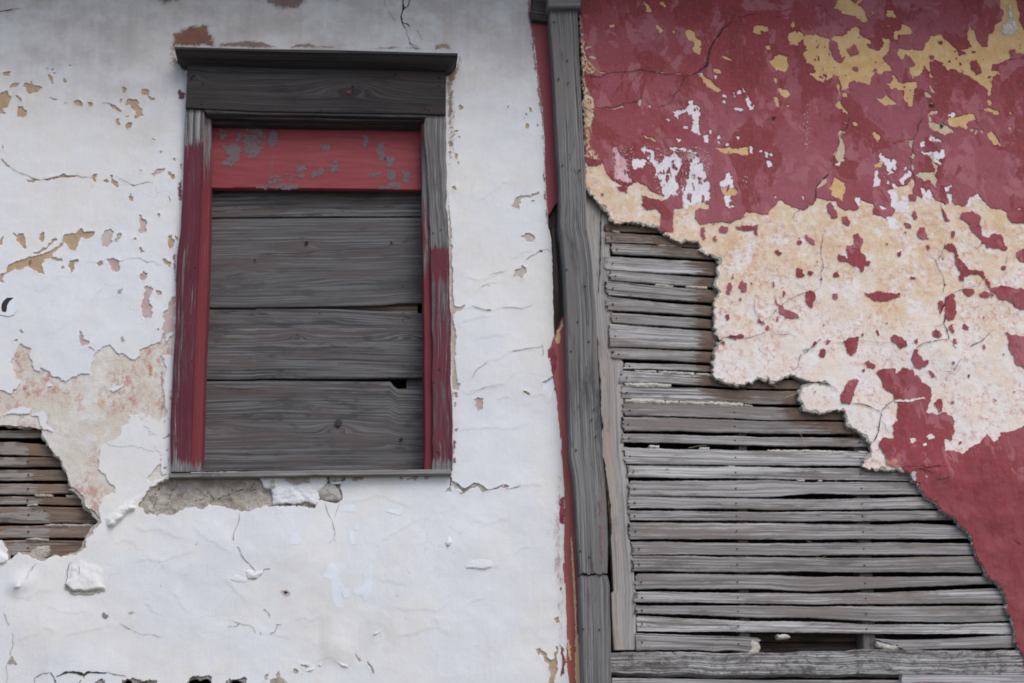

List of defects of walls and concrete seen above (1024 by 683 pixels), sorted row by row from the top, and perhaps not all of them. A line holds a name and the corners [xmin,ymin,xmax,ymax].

crack [384,0,422,48]
crack [581,13,777,110]
peeling [0,214,160,282]
peeling [577,0,1024,525]
peeling [0,272,364,541]
crack [446,477,520,495]
spalling [748,539,852,558]
spalling [871,539,974,558]
spalling [634,571,734,636]
spalling [749,589,856,643]
spalling [873,572,1004,607]
spalling [875,621,1016,651]